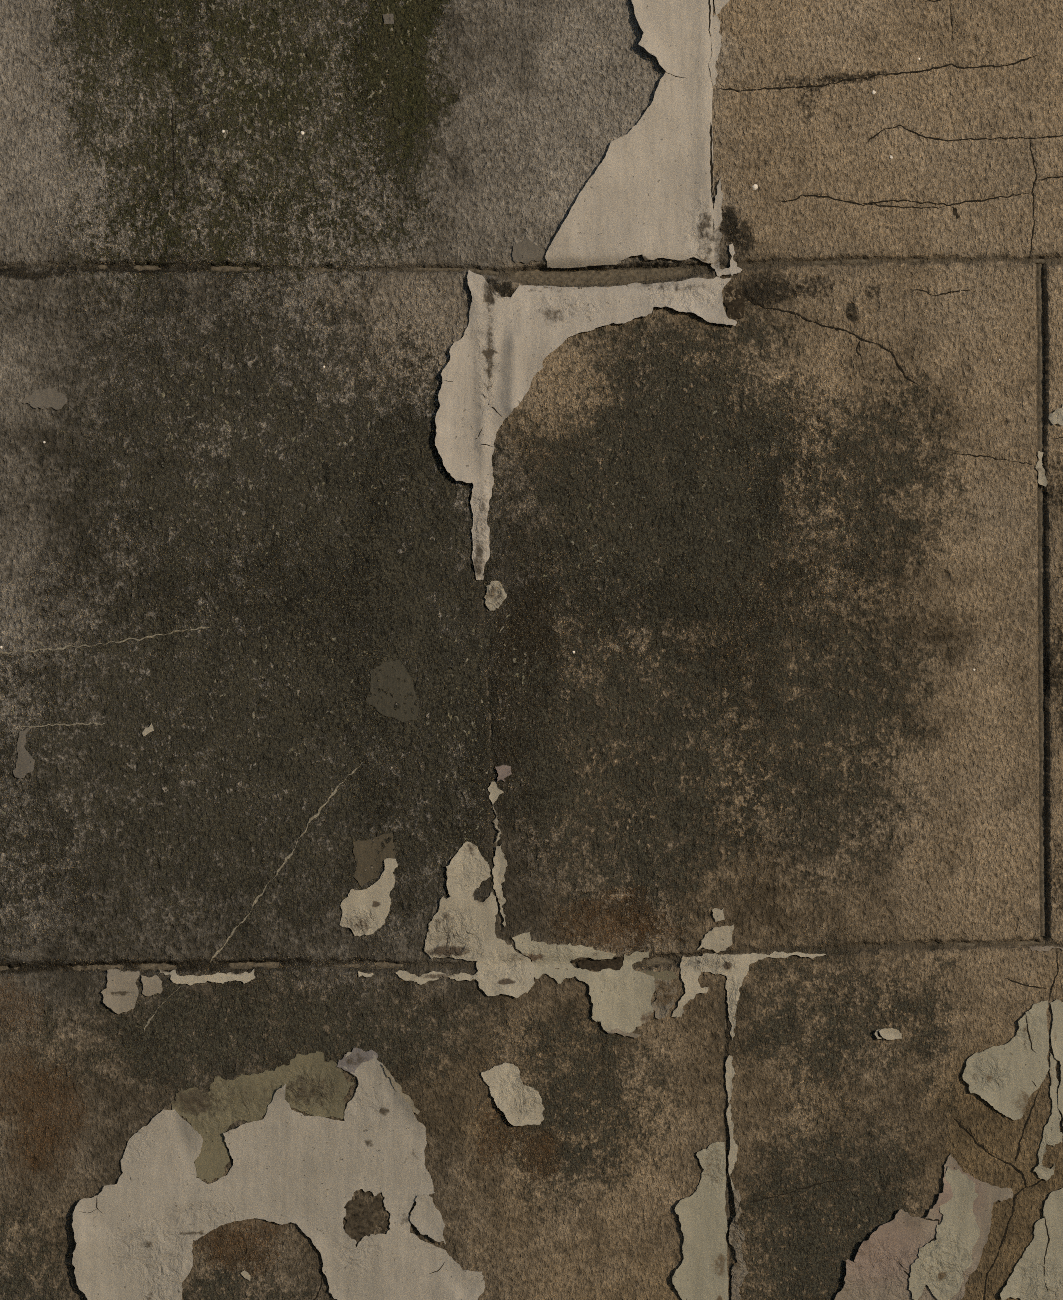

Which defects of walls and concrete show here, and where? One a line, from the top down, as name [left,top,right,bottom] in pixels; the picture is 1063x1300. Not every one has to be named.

peeling [435,0,745,611]
crack [705,0,713,37]
crack [707,123,715,203]
crack [721,55,1039,92]
crack [777,124,1063,257]
leakage [0,0,977,961]
peeling [340,833,398,937]
peeling [72,1047,485,1300]
peeling [396,765,826,1300]
peeling [834,1154,1013,1300]
crack [954,951,1059,1300]
peeling [962,999,1063,1300]